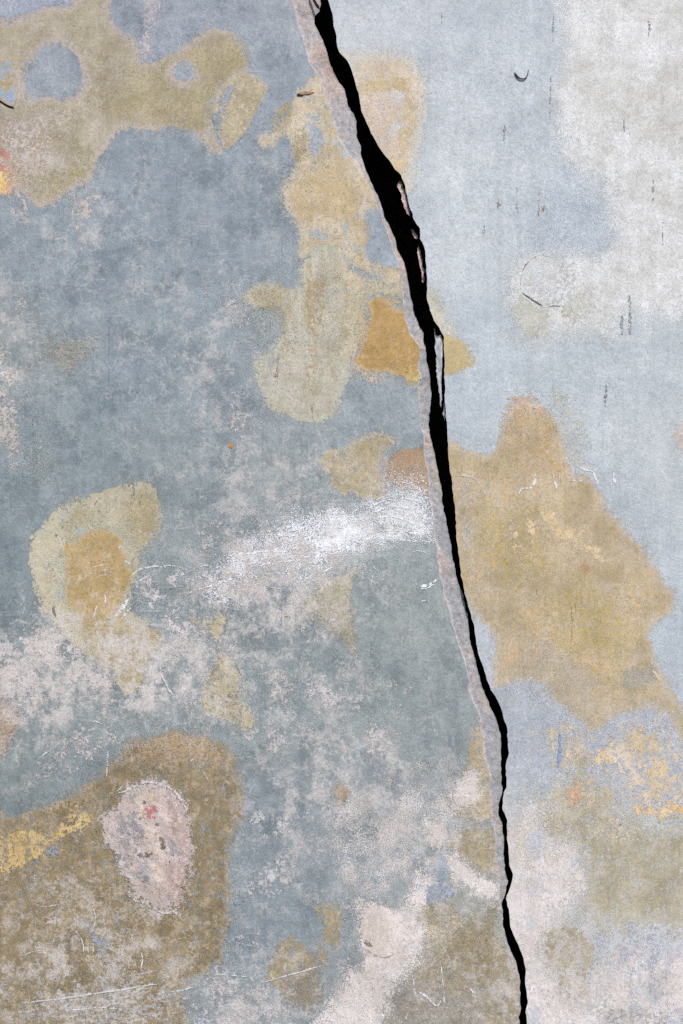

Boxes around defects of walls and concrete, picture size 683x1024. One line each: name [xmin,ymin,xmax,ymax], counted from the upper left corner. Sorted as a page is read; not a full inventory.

leakage [249,70,405,359]
leakage [0,383,683,1024]
crack [292,0,528,1024]
leakage [427,277,478,377]